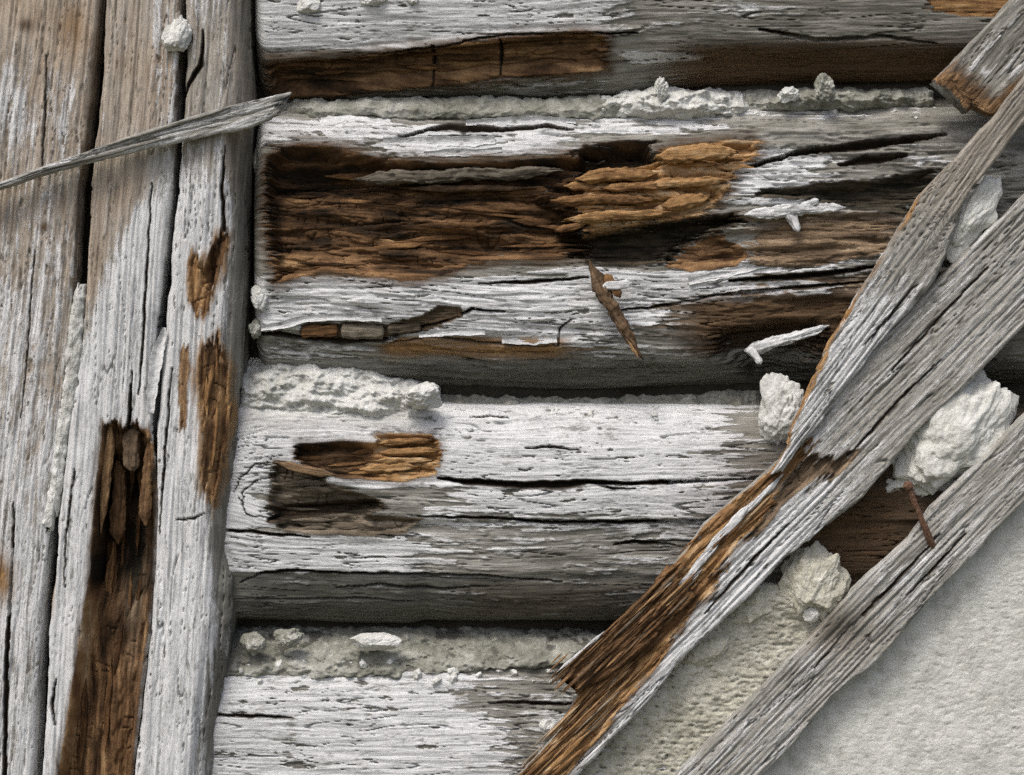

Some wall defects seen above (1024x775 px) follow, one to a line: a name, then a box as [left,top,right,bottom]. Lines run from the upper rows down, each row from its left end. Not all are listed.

crack [186,30,204,96]
crack [742,133,947,168]
spalling [256,137,766,288]
crack [127,182,153,429]
crack [261,331,396,344]
crack [463,277,589,314]
spalling [264,433,446,536]
crack [438,477,670,490]
spalling [58,327,167,775]